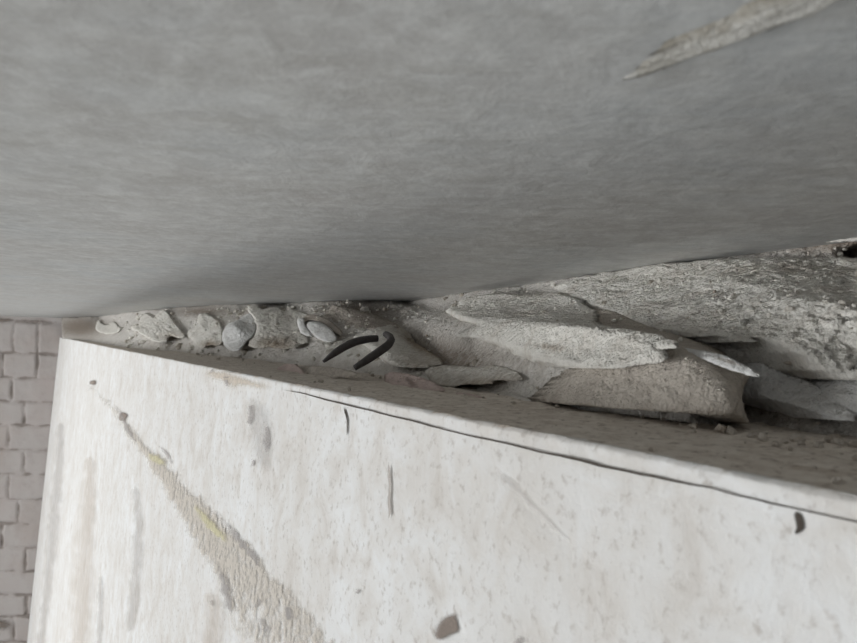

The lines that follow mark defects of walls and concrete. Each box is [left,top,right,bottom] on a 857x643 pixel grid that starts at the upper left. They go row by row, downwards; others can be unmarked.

peeling [685,348,761,377]